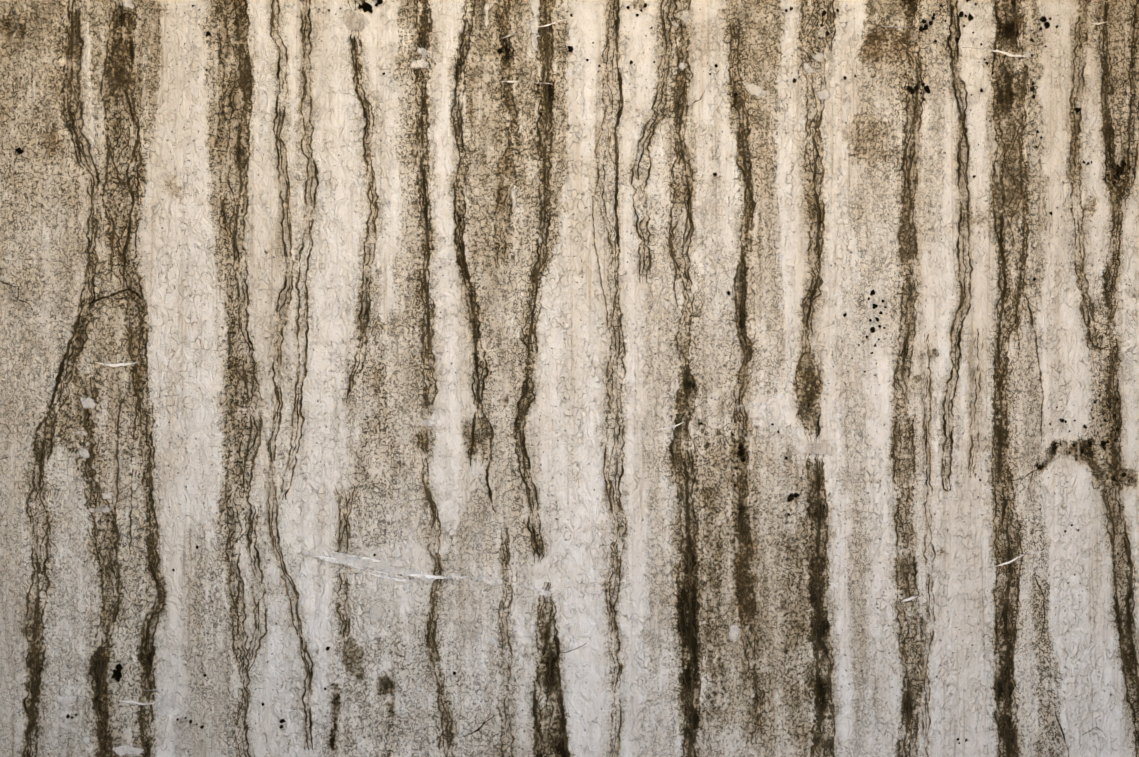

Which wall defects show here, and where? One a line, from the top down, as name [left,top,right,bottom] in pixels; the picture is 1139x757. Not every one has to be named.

water stain [300,0,383,204]
water stain [346,0,438,414]
water stain [202,0,340,757]
water stain [586,0,839,757]
water stain [843,0,1139,757]
water stain [188,572,214,635]
water stain [325,574,363,678]
water stain [337,487,355,560]
water stain [379,676,394,713]
water stain [417,432,441,659]
water stain [436,671,456,757]
water stain [530,584,570,757]